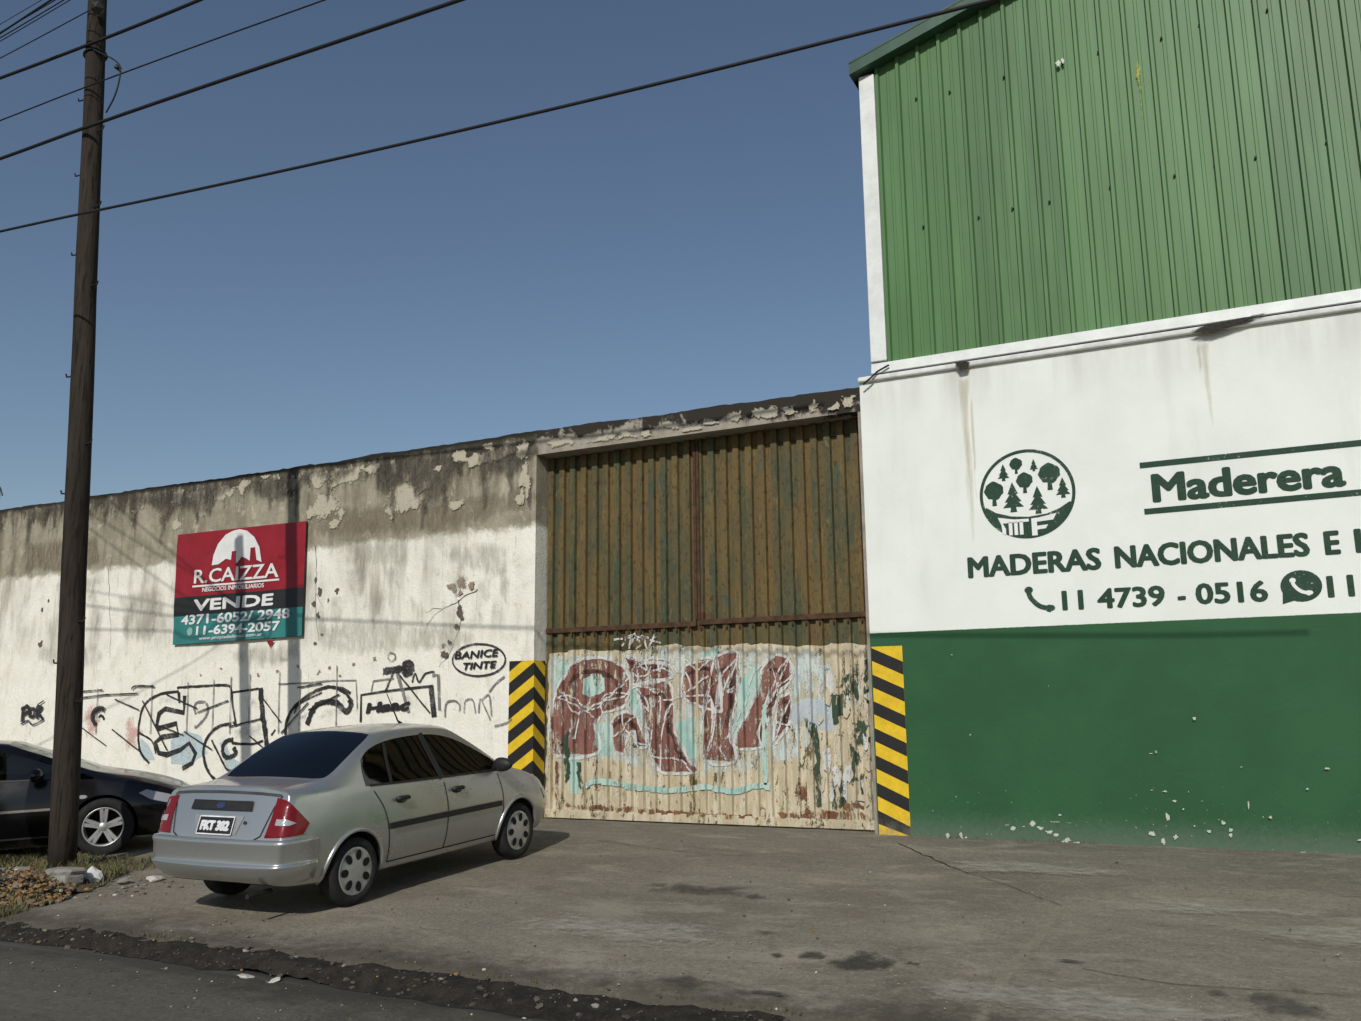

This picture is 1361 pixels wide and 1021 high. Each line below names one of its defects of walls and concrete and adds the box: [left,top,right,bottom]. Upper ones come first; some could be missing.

peeling [547,395,855,448]
damp [133,487,229,528]
damp [254,467,355,507]
peeling [170,439,531,531]
damp [318,444,537,533]
damp [24,509,62,568]
damp [87,539,97,565]
peeling [804,659,873,809]
rust [555,761,870,821]
peeling [1005,814,1080,843]